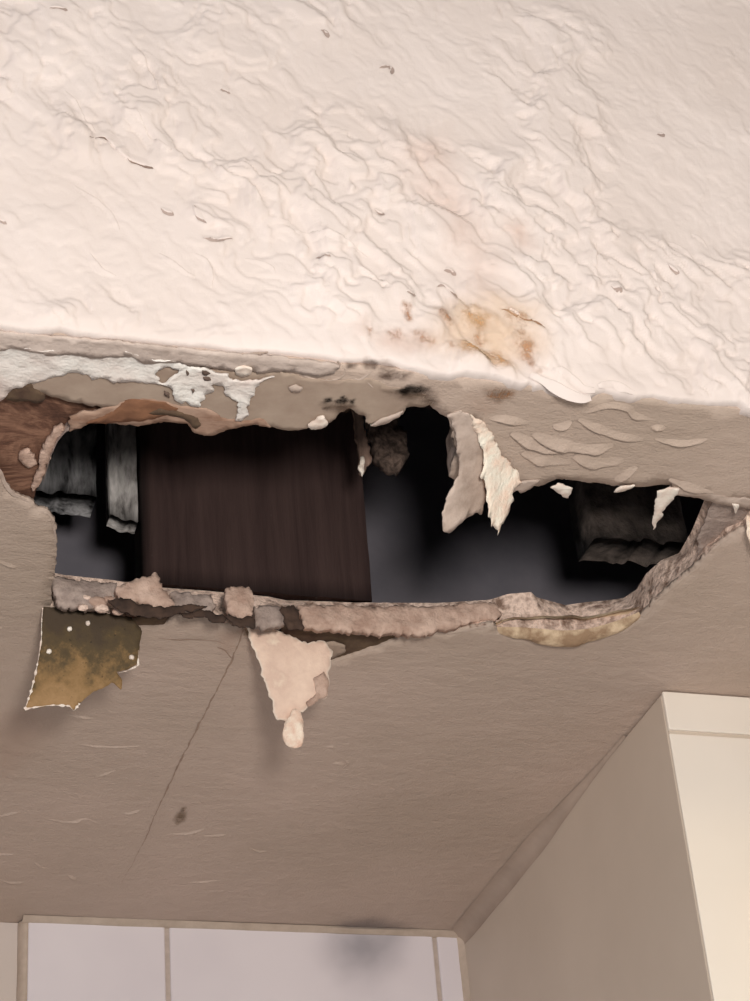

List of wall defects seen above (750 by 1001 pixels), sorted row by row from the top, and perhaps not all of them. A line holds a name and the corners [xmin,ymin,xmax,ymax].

peeling [0,330,431,482]
spalling [446,417,456,478]
spalling [550,479,573,498]
spalling [50,483,750,659]
crack [128,628,245,871]